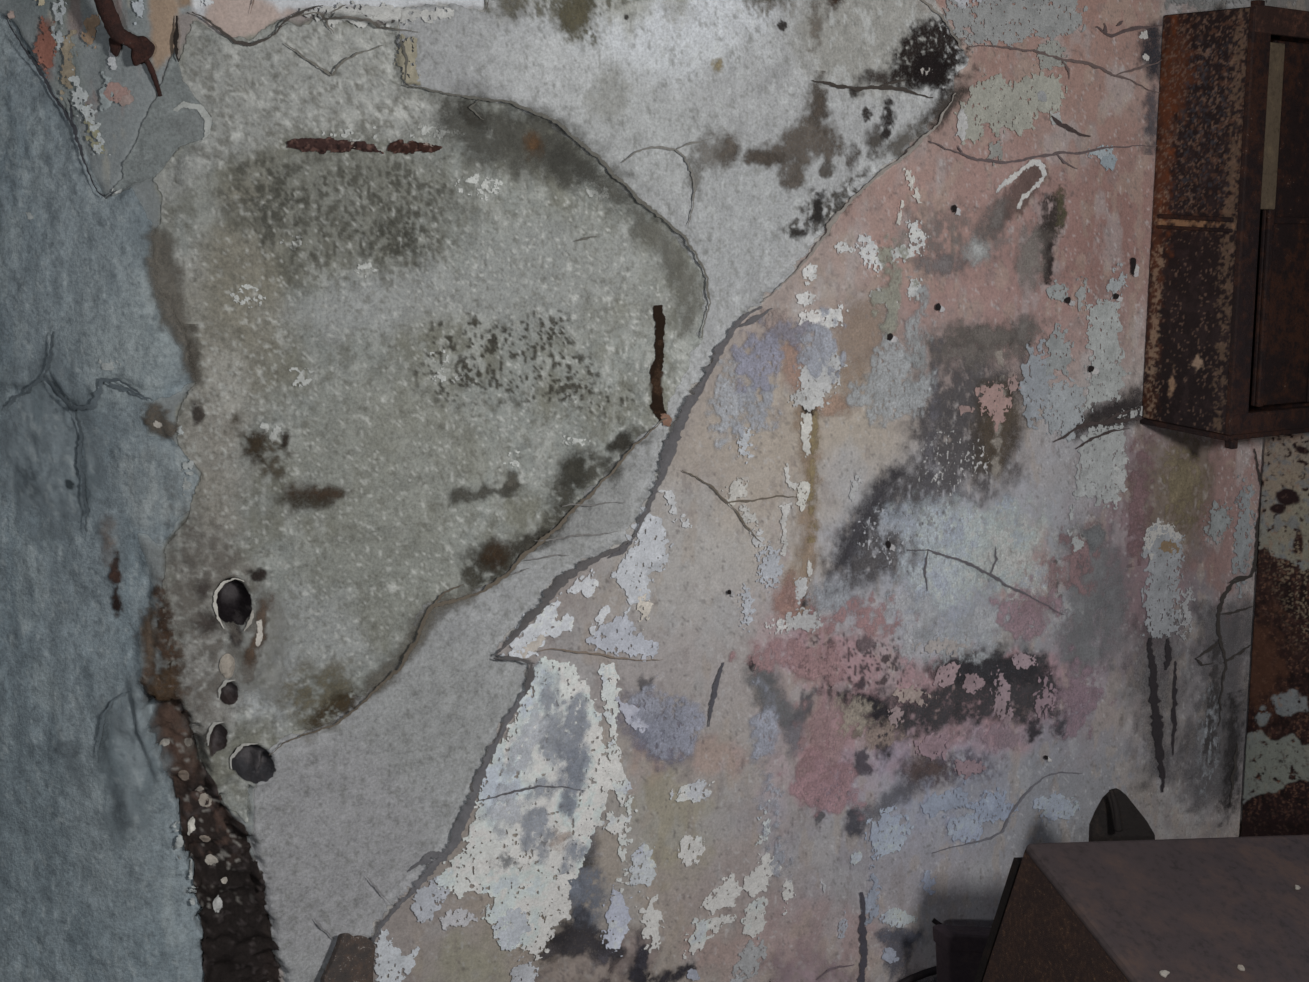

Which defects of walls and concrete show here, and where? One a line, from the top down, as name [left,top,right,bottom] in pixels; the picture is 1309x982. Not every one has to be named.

peeling [954,71,1068,160]
damp [416,311,633,407]
crack [173,0,1163,944]
damp [775,305,885,619]
corrosion [140,587,192,701]
peeling [507,597,574,659]
damp [748,636,904,775]
peeling [683,263,1143,982]
damp [947,658,1042,683]
crack [1147,448,1262,805]
peeling [374,925,420,982]
peeling [600,843,665,953]